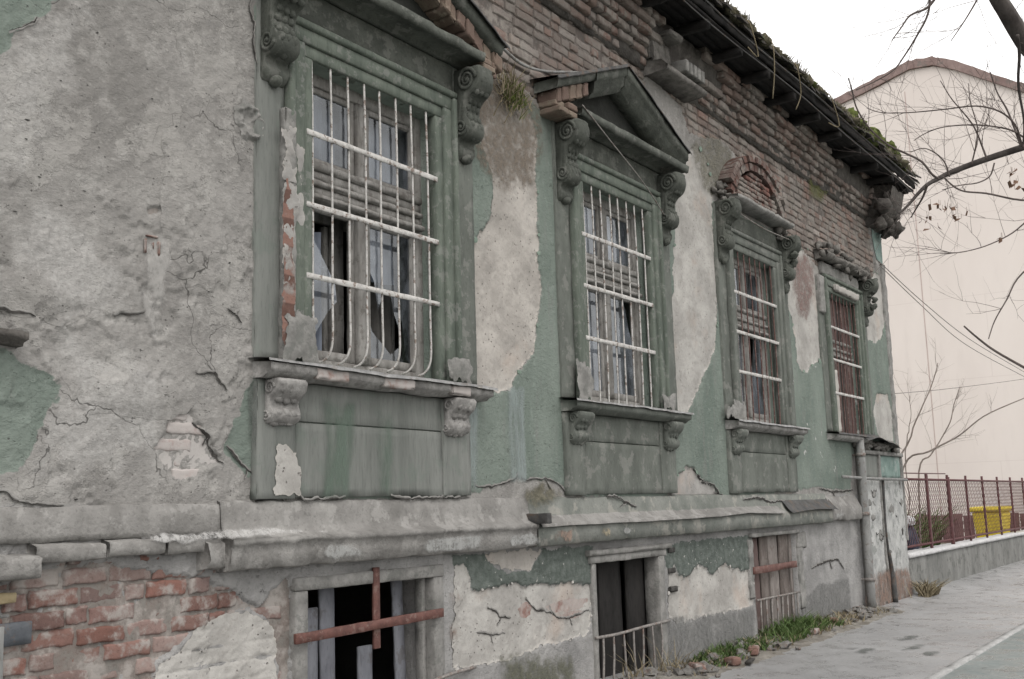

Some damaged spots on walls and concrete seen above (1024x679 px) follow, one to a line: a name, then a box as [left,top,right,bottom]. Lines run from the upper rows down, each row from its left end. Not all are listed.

spalling [414,0,645,399]
spalling [281,126,349,383]
spalling [662,92,885,412]
crack [228,307,243,323]
crack [196,361,228,390]
crack [192,421,252,479]
spalling [273,443,301,496]
spalling [873,394,893,441]
flaking render [0,555,290,679]
spalling [426,533,592,671]
crack [477,597,589,643]
spalling [667,538,756,624]